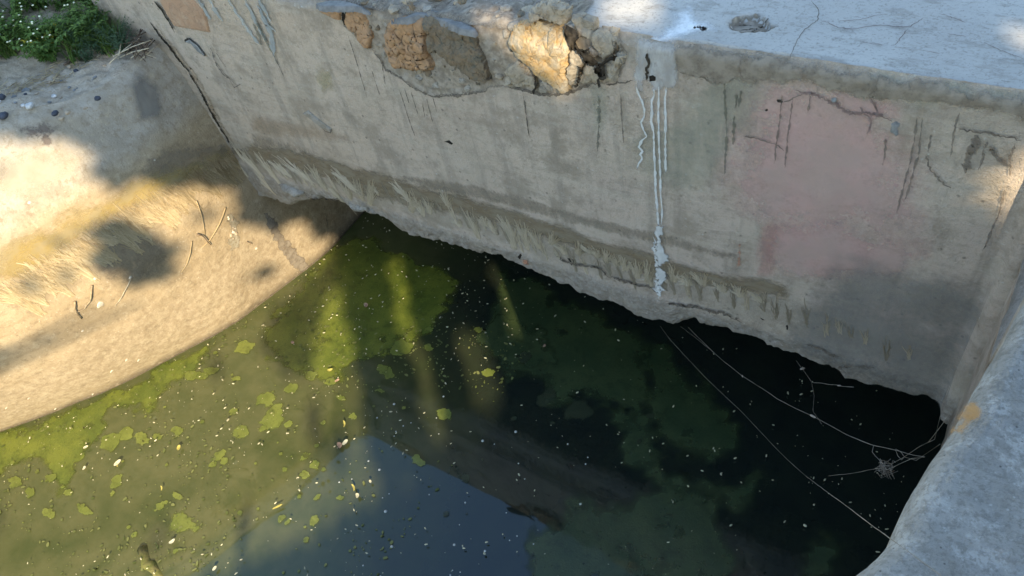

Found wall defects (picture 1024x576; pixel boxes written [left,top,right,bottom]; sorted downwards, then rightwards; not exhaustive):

crack [151,2,233,149]
spalling [319,0,628,98]
crack [790,2,1021,58]
water stain [0,0,786,298]
crack [784,90,891,133]
crack [925,156,951,188]
crack [962,129,1021,141]